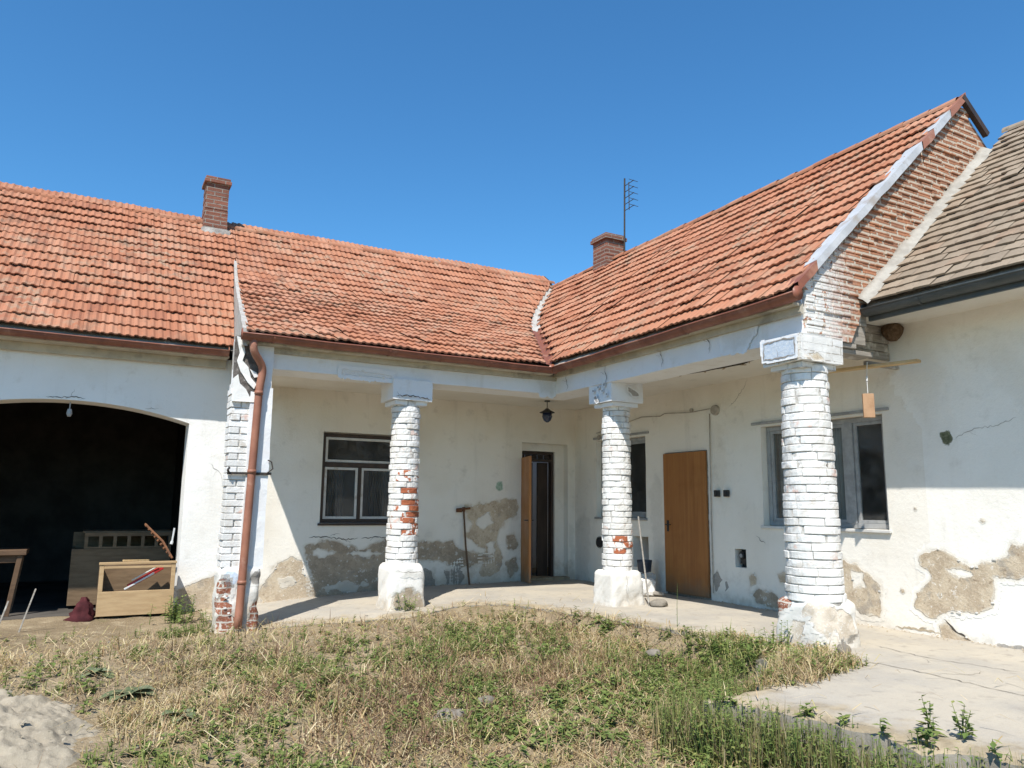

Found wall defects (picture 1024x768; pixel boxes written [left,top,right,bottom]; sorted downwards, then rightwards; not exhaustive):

flaking render [172,470,521,633]
flaking render [607,536,633,554]
flaking render [746,538,1024,646]